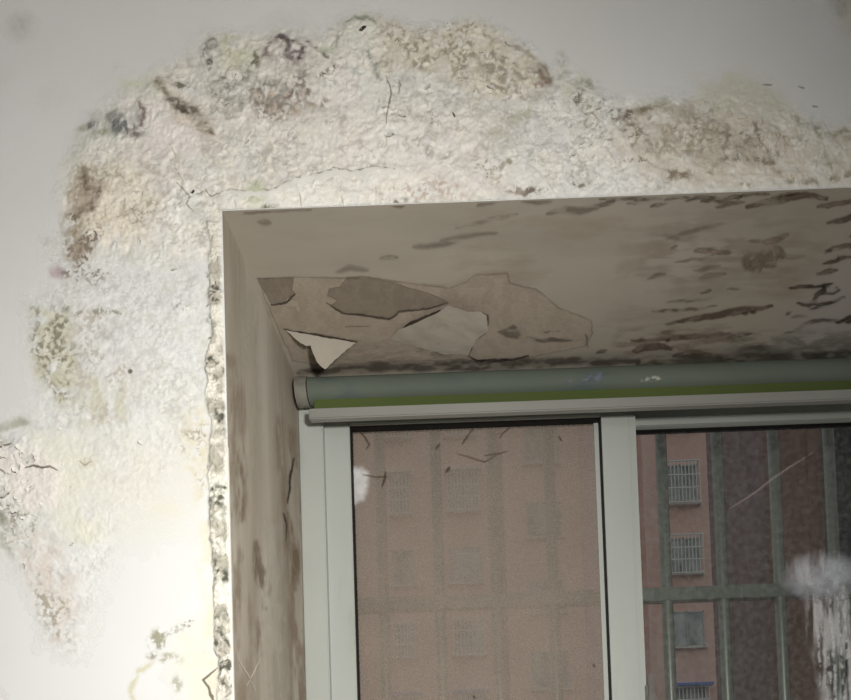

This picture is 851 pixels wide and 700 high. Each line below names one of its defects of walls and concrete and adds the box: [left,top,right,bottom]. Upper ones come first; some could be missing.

damp [34,0,851,291]
peeling [257,273,592,369]
damp [298,301,851,374]
damp [789,236,851,309]
damp [0,294,144,667]
flaking render [169,164,433,700]
damp [254,528,282,664]
damp [291,544,301,655]
damp [126,612,214,700]